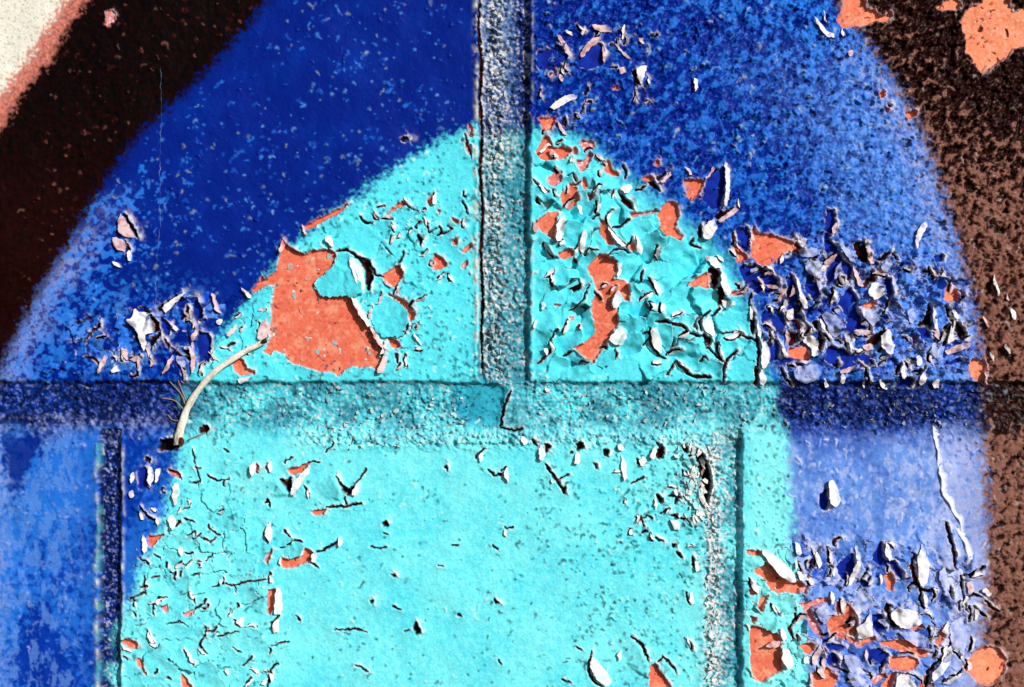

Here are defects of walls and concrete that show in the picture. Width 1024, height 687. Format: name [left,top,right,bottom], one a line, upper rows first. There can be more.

peeling [537,24,658,105]
peeling [936,0,1024,72]
peeling [112,213,138,268]
peeling [360,192,472,281]
peeling [533,88,994,428]
peeling [85,235,470,499]
peeling [129,457,181,565]
peeling [263,521,343,633]
crack [476,448,509,482]
crack [500,391,569,493]
spalling [593,442,720,687]
peeling [745,537,1005,687]